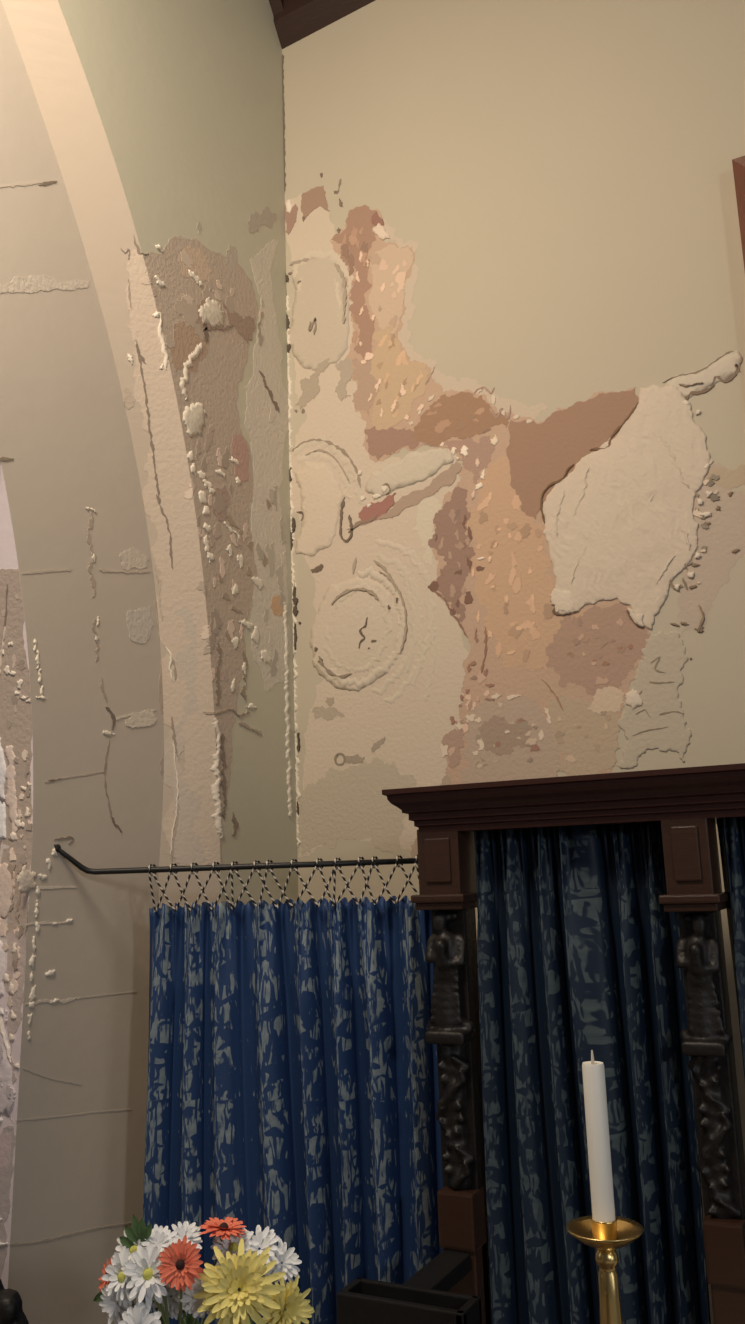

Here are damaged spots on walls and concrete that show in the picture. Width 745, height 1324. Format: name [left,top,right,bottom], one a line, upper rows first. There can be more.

crack [280,54,288,192]
crack [2,584,10,626]
crack [136,341,173,569]
flaking render [187,173,337,693]
crack [292,438,488,678]
peeling [330,205,710,785]
crack [540,351,740,523]
flaking render [0,569,33,1117]